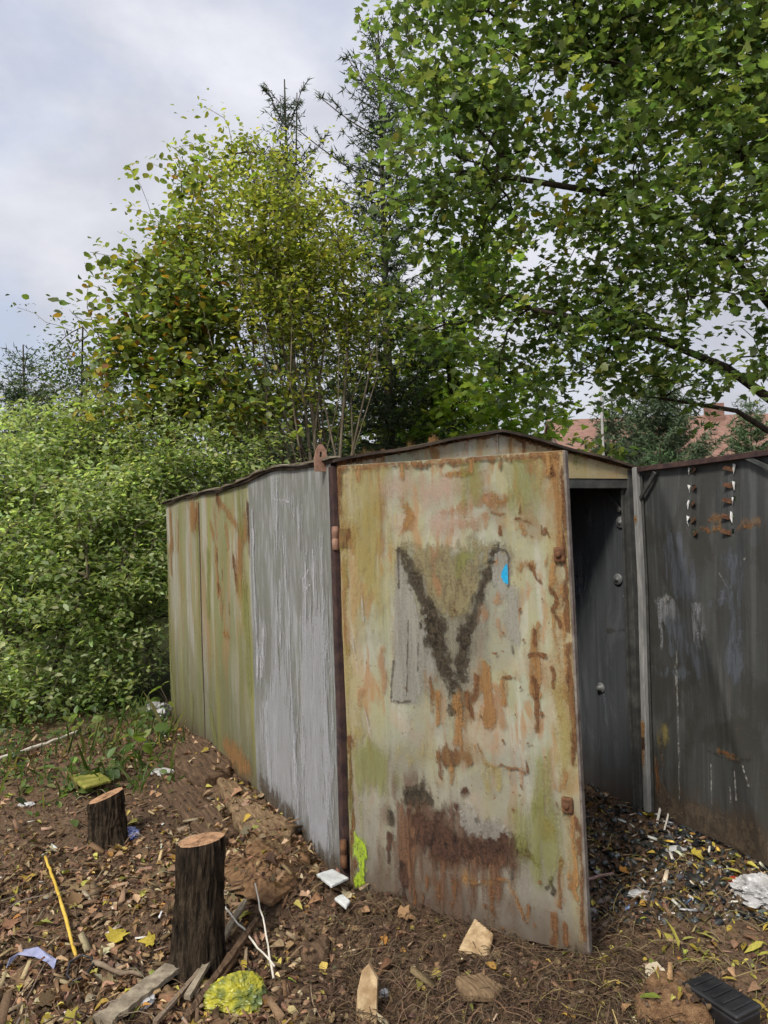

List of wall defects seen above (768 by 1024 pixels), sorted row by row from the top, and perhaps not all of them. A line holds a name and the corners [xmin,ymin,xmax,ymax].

corrosion [169,495,247,614]
corrosion [337,434,622,805]
corrosion [549,814,586,946]